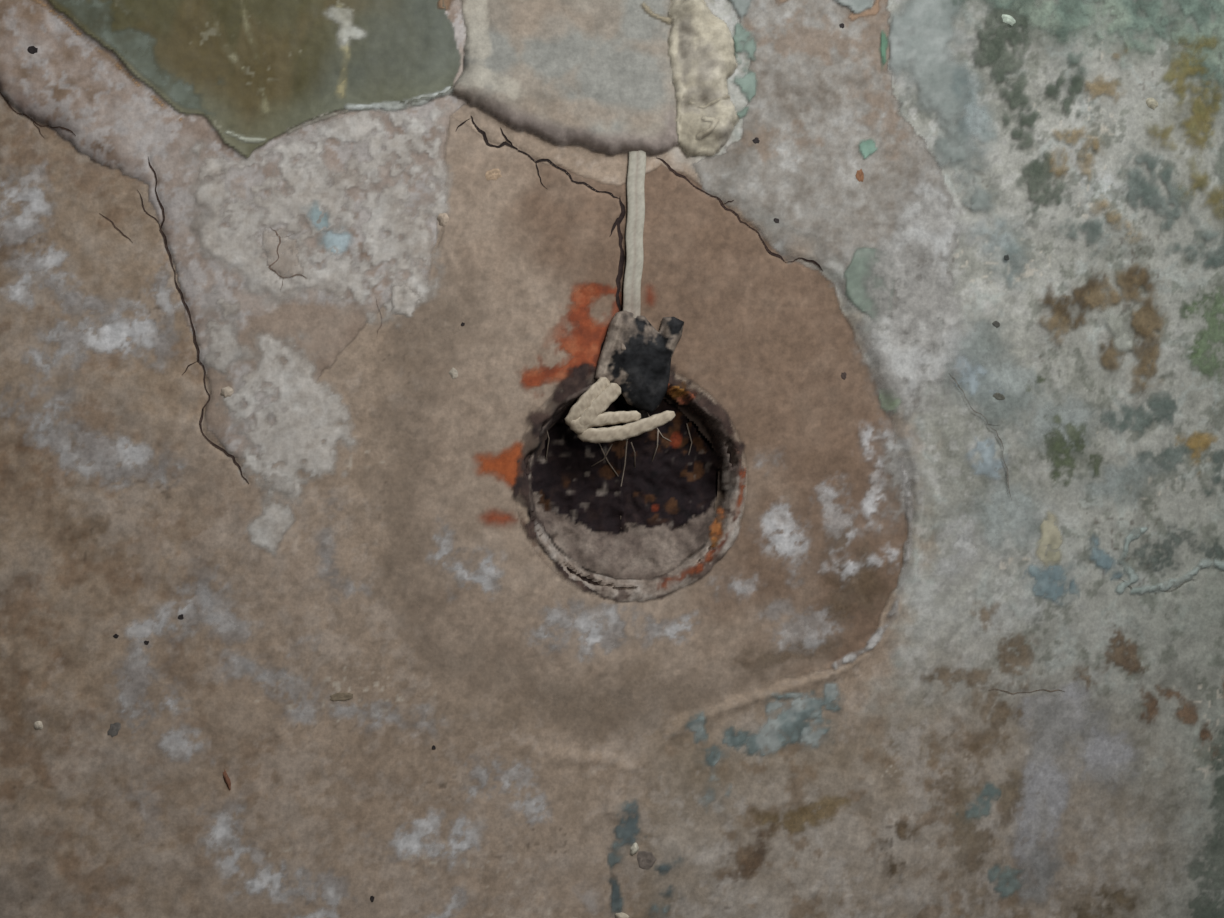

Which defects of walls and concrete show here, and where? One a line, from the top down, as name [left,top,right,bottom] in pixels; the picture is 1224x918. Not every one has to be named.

peeling [34,0,461,157]
mould [975,0,1224,147]
crack [456,116,626,312]
crack [658,158,823,271]
mould [1019,152,1066,211]
crack [138,157,249,484]
corrosion [478,443,522,486]
corrosion [522,284,621,387]
spalling [389,0,992,747]
mould [1103,395,1176,432]
corrosion [662,509,726,587]
peeling [687,714,748,766]